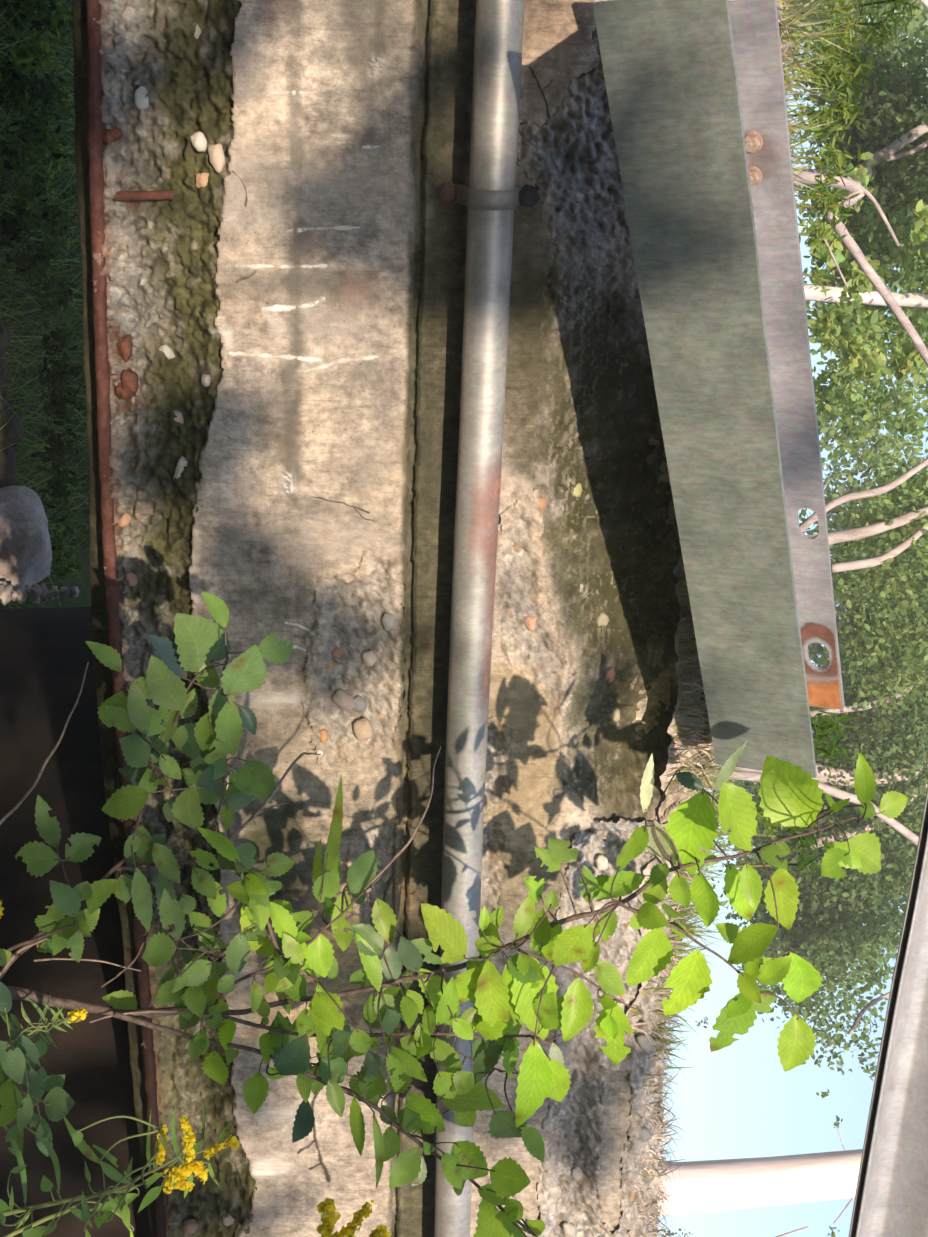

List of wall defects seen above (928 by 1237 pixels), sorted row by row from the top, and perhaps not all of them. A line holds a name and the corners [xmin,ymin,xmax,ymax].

corrosion [115,727,132,789]
corrosion [86,0,174,696]
spalling [89,0,253,697]
peeling [281,473,295,493]
spalling [296,517,410,767]
damp [500,703,545,731]
spalling [492,19,688,1237]
damp [547,288,678,650]
spalling [693,685,719,774]
corrosion [130,898,167,1237]
spalling [121,671,258,1237]